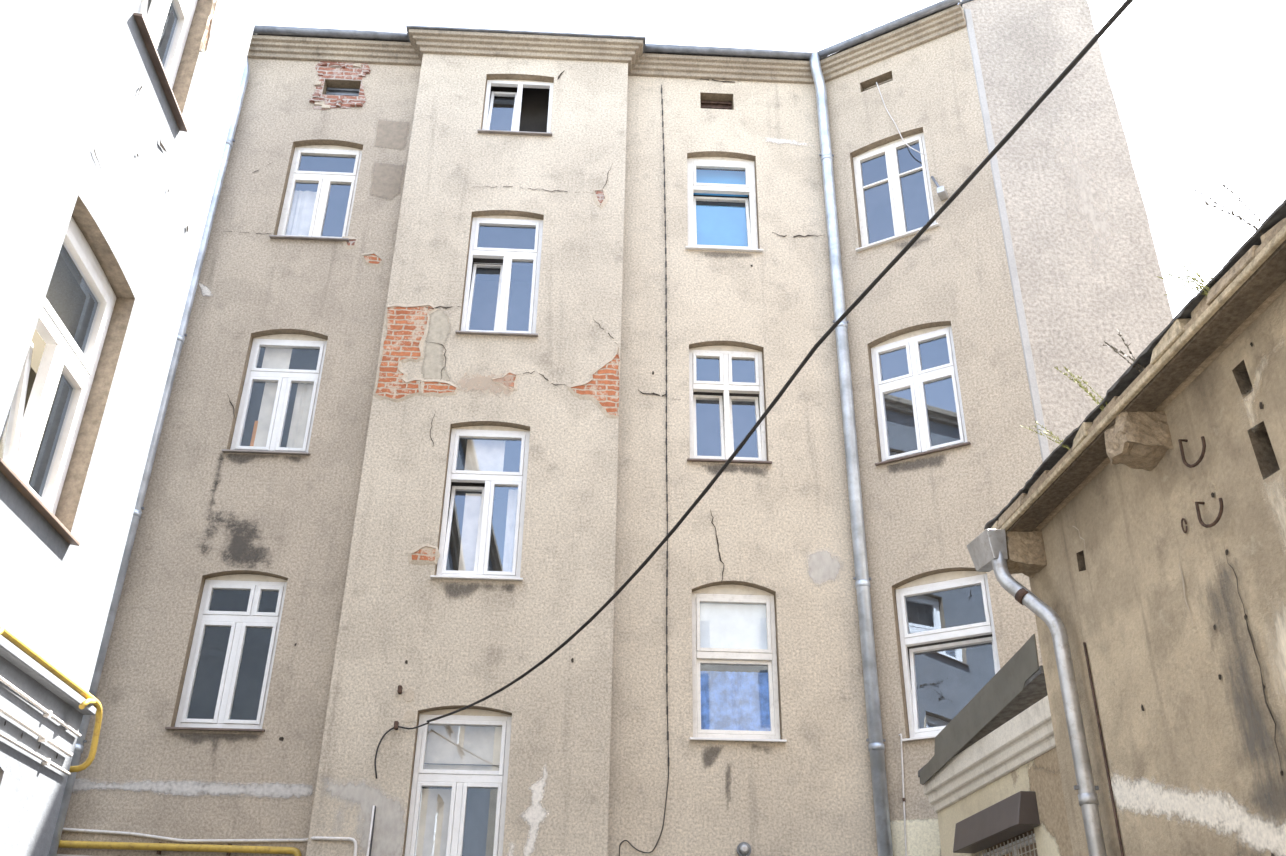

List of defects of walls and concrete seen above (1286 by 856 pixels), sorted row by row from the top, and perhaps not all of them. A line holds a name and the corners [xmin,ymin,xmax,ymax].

flaking render [309,61,371,110]
flaking render [373,302,459,403]
flaking render [566,346,620,419]
damp [202,454,266,568]
flaking render [407,543,440,565]
crack [710,509,724,583]
peeling [508,767,547,856]